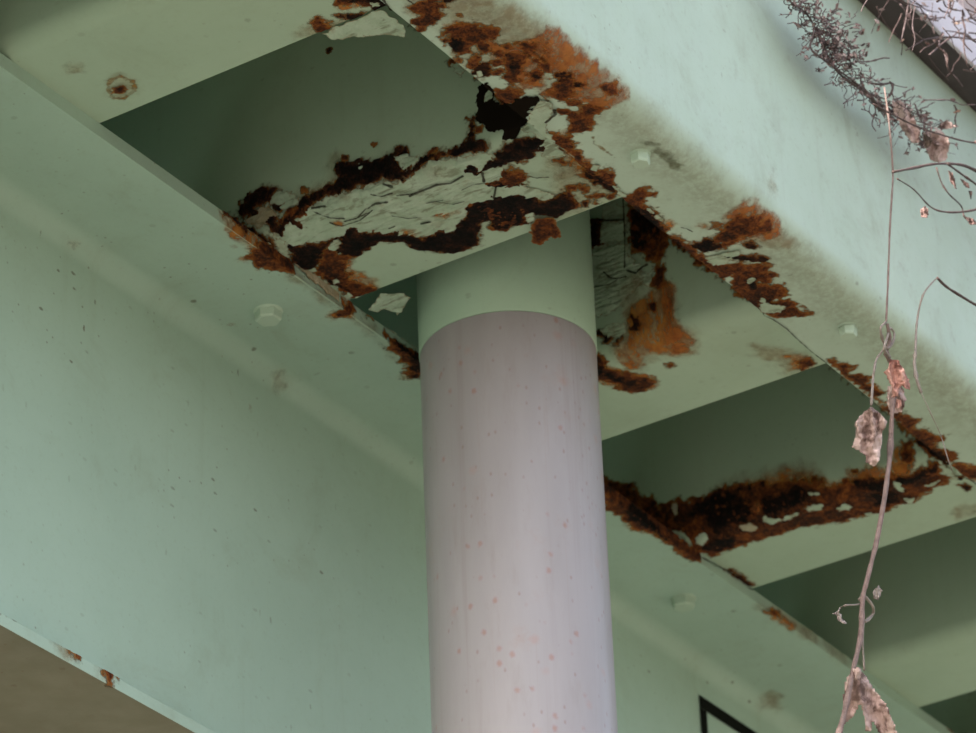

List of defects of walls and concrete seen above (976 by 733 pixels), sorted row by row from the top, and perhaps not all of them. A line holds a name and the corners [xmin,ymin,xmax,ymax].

rust [107,75,137,100]
rust [309,16,334,33]
rust [406,0,627,134]
peeling [238,101,577,270]
rust [557,182,617,209]
rust [222,210,377,321]
peeling [590,198,648,318]
rust [596,202,827,394]
rust [382,328,420,380]
rust [603,438,951,590]
rust [763,607,795,630]